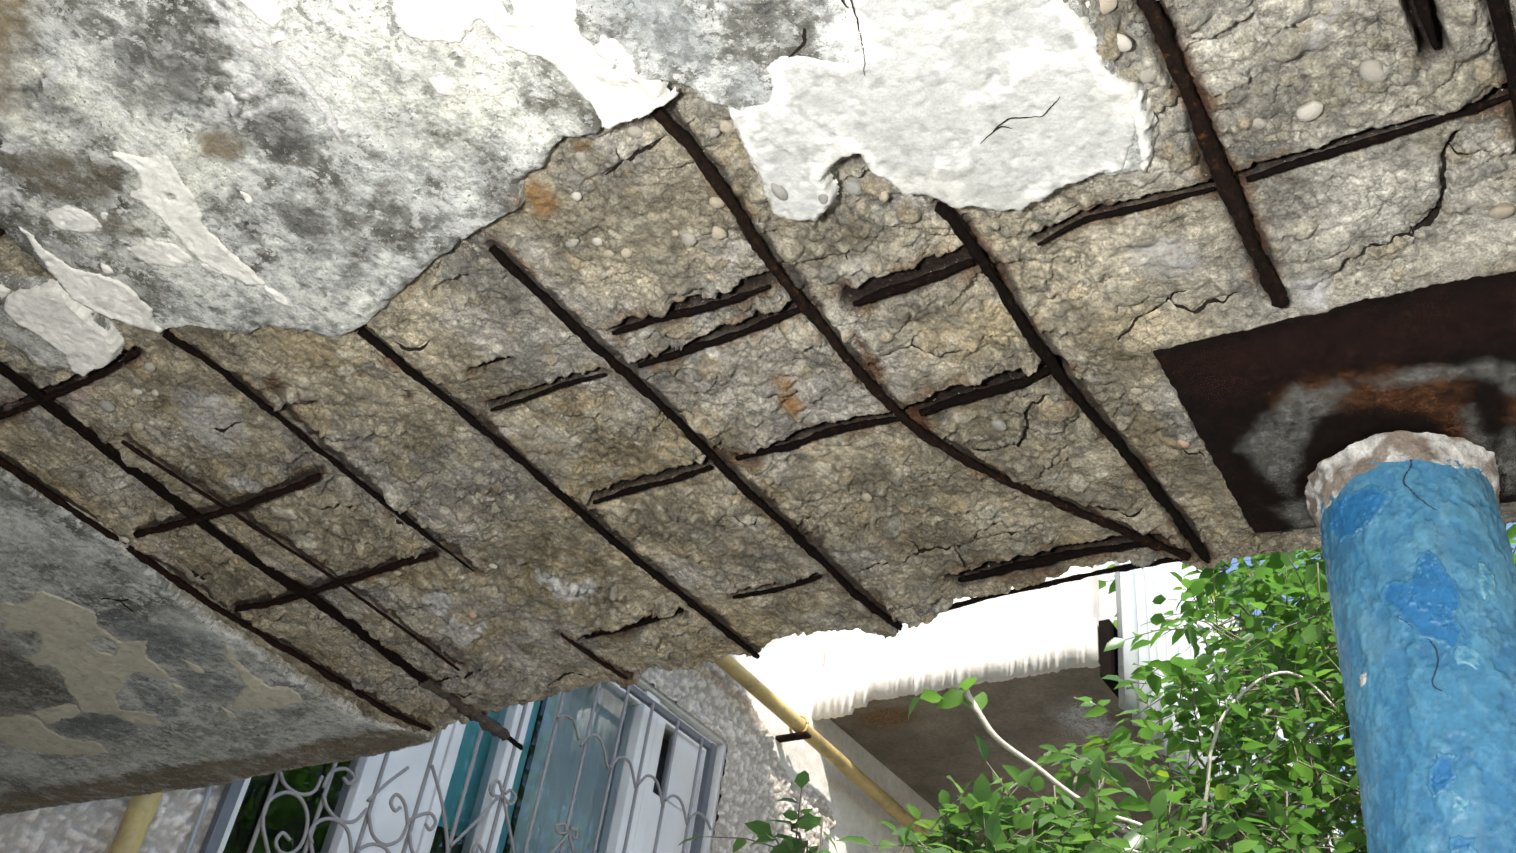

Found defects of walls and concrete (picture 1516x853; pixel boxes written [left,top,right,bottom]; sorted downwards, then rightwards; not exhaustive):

crack [841,0,865,75]
crack [980,96,1060,144]
crack [1341,130,1487,265]
spalling [391,0,1516,570]
crack [1117,290,1237,341]
rust [1277,366,1476,444]
spalling [0,114,1182,821]
peeling [1379,550,1480,669]
spalling [746,691,927,853]